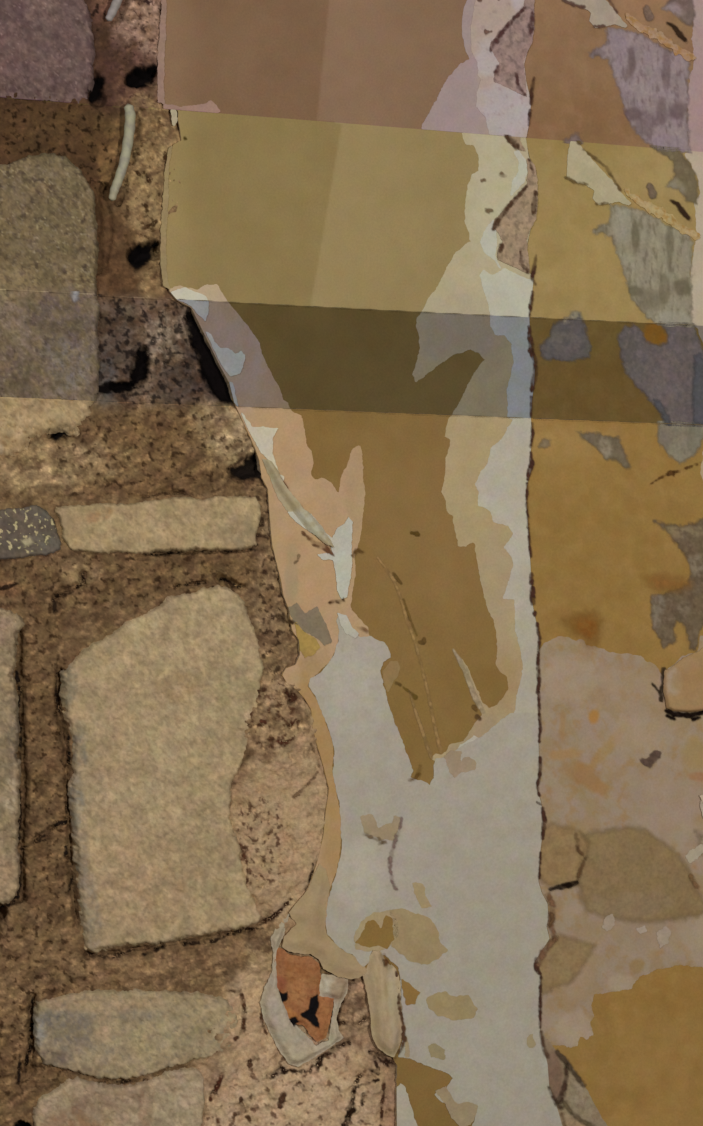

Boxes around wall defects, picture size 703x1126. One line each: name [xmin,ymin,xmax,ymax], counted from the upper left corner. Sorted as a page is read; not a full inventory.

crack [527,77,535,120]
peeling [163,0,703,1126]
crack [526,266,585,927]
crack [652,667,703,721]
crack [534,960,542,1028]